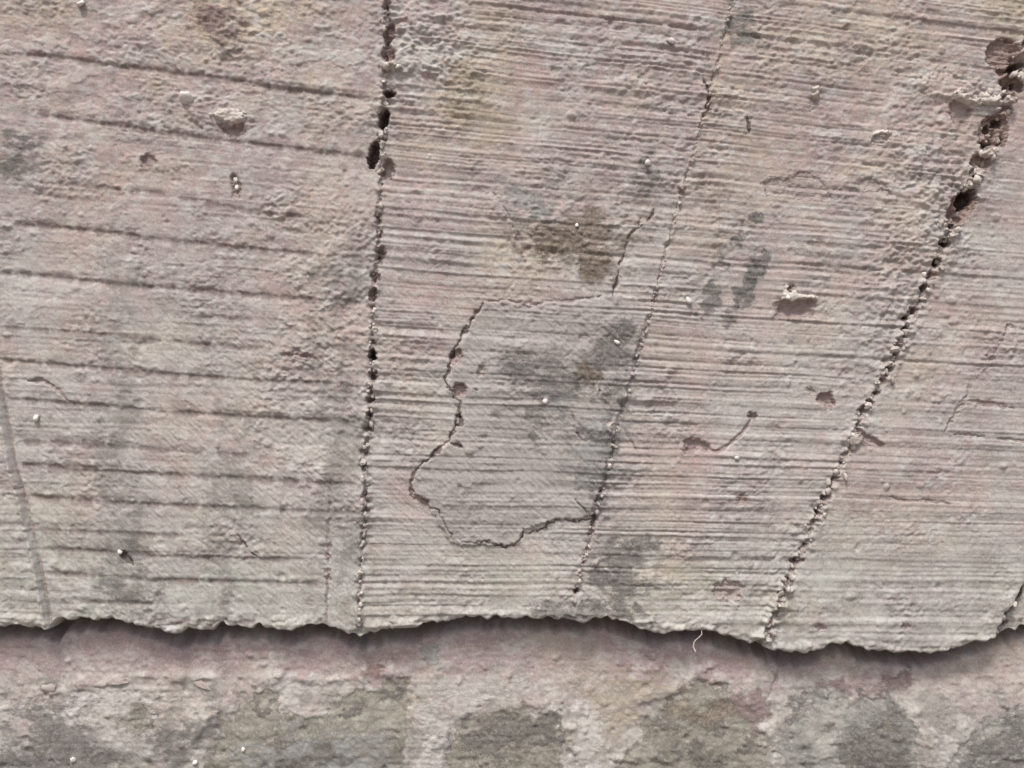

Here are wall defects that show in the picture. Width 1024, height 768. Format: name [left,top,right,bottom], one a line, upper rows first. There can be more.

crack [409,1,751,608]
spalling [948,87,999,128]